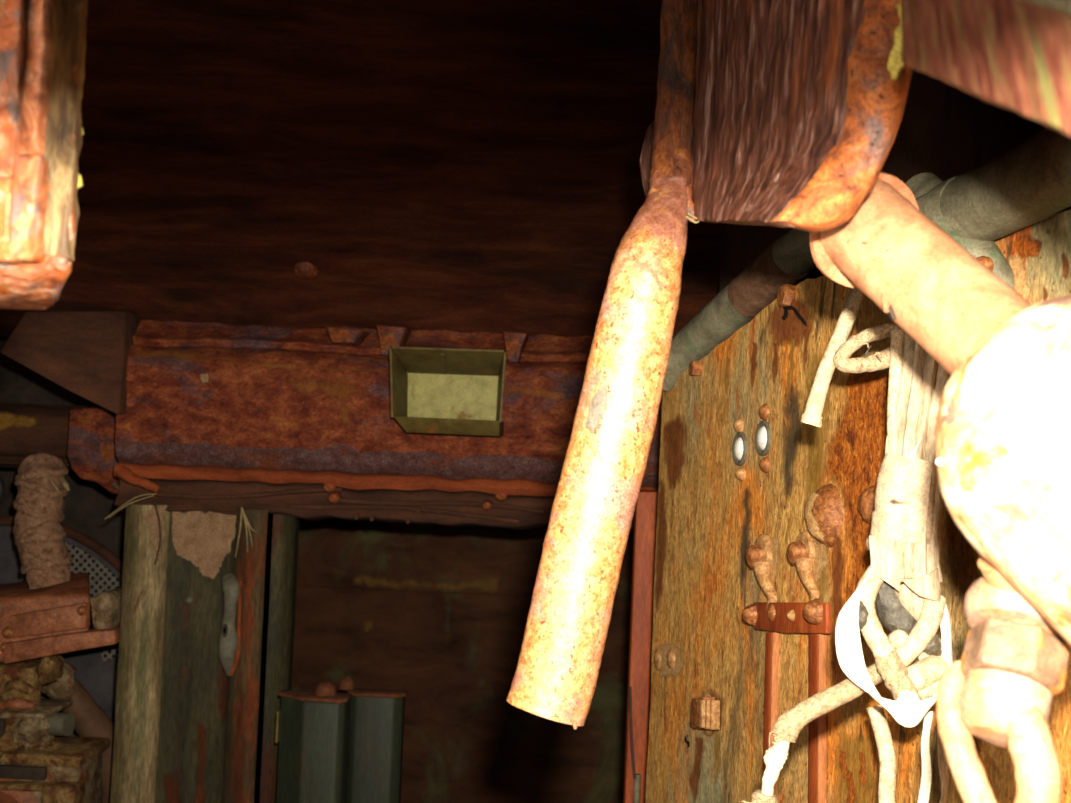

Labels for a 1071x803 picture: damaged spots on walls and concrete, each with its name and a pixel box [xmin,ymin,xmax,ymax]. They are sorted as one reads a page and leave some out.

rust [770,299,821,403]
peeling [142,508,236,579]
rust [655,417,687,608]
rust [807,371,889,671]
rust [690,692,722,800]